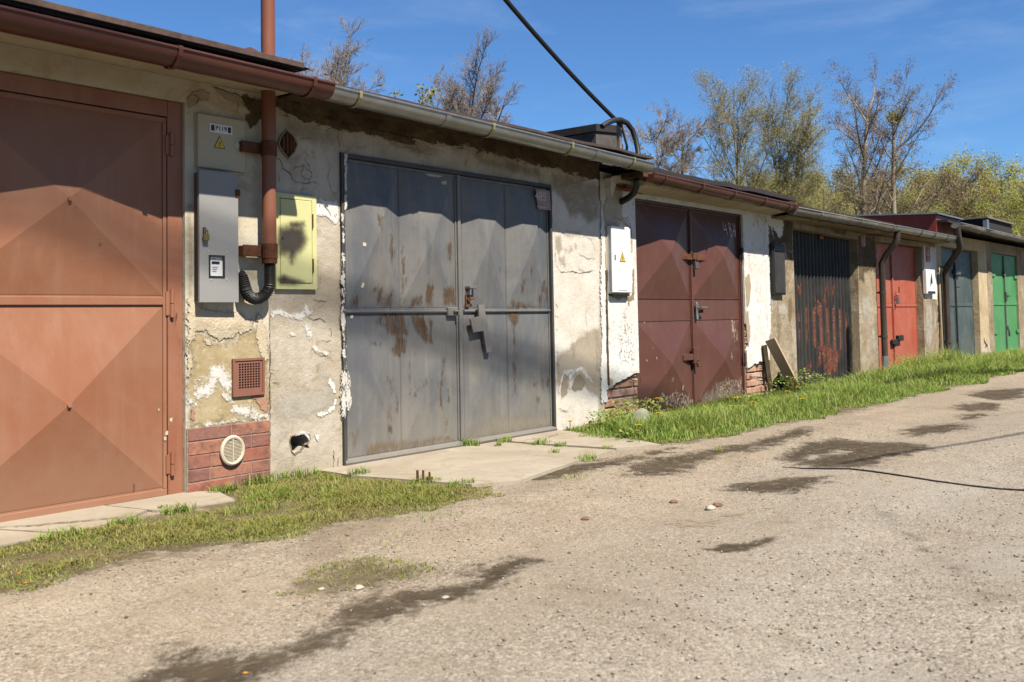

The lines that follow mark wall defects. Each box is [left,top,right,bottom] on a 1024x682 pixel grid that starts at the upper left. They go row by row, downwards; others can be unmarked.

peeling [187,87,261,129]
peeling [316,153,353,417]
corrosion [375,285,455,355]
corrosion [509,267,548,344]
peeling [600,188,633,404]
peeling [185,297,272,428]
water stain [556,329,601,397]
spalling [289,431,320,455]